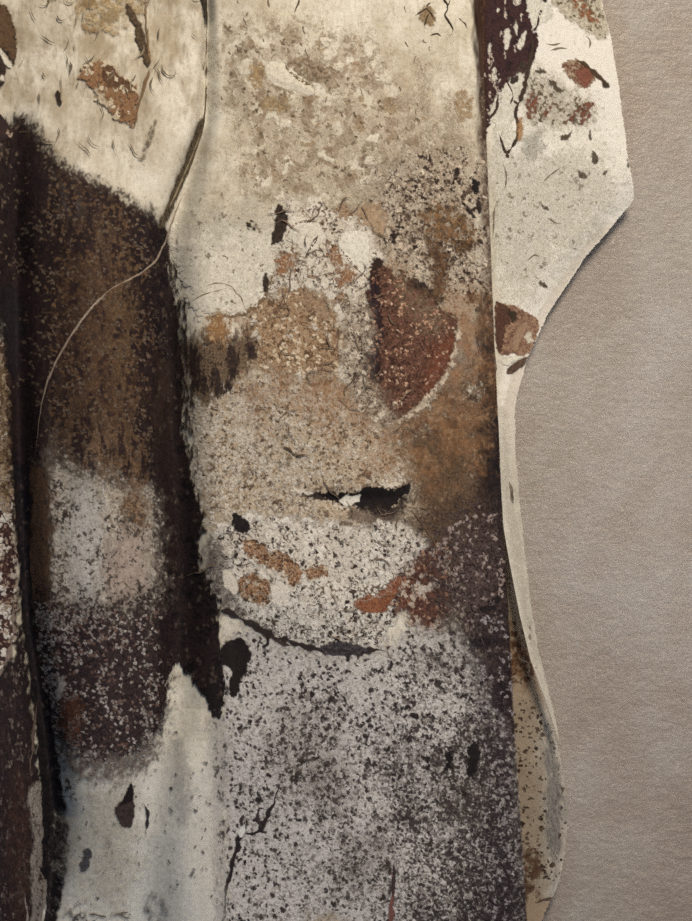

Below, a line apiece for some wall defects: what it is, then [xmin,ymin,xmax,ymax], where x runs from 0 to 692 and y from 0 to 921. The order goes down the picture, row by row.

peeling [0,4,17,89]
crack [267,266,323,317]
crack [269,197,391,247]
peeling [170,0,609,542]
leakage [462,178,481,218]
crack [277,409,310,457]
crack [277,325,417,442]
leakage [0,112,260,921]
crack [323,479,353,520]
crack [217,493,440,660]
leakage [348,290,542,921]
crack [222,785,280,921]